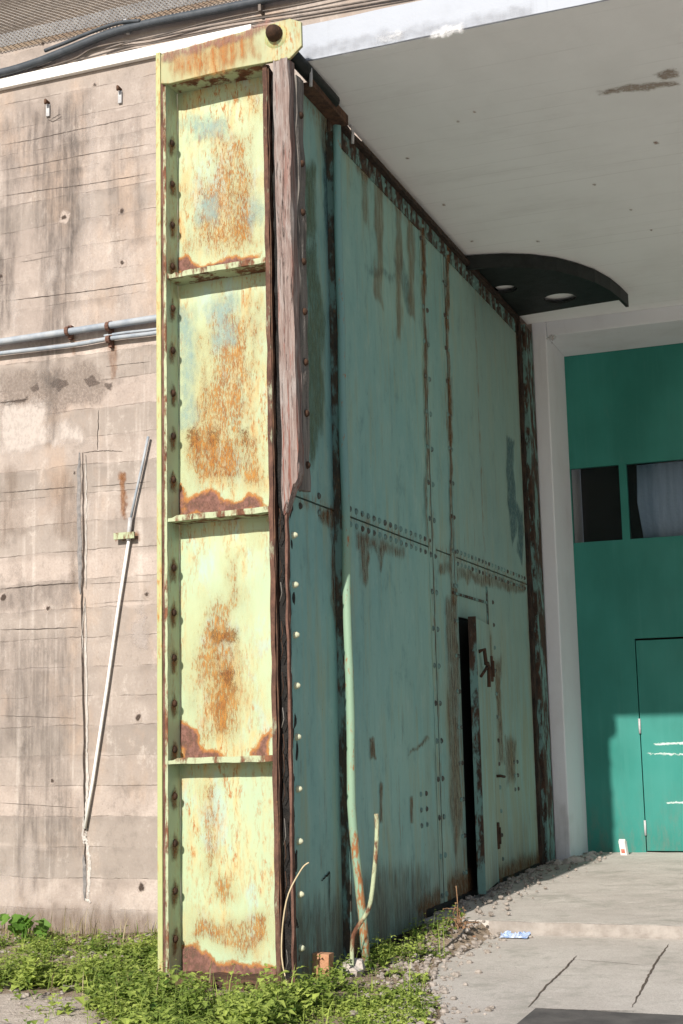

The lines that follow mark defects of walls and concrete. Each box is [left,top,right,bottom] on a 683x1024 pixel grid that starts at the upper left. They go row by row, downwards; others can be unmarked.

rust [163,19,269,71]
rust [170,134,259,274]
rust [170,297,265,515]
rust [440,246,521,850]
rust [171,564,242,760]
rust [250,729,272,756]
rust [205,782,217,867]
rust [173,913,276,975]
crack [528,945,668,1011]